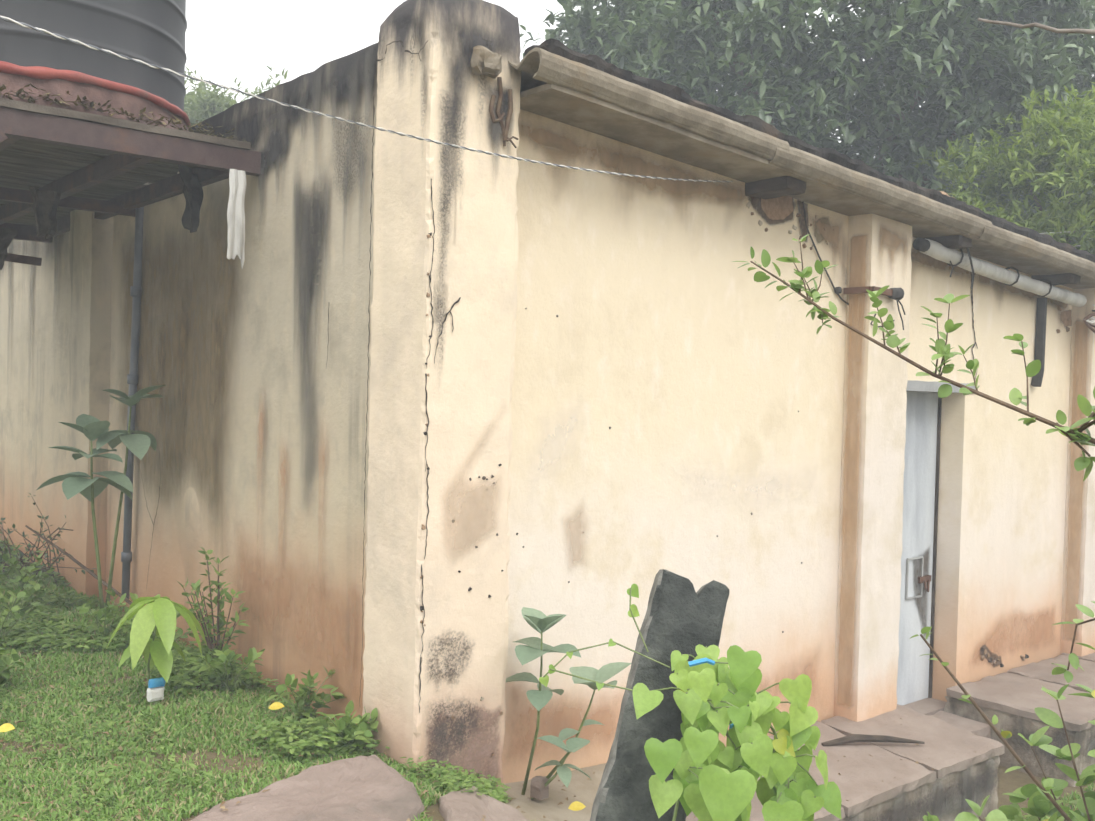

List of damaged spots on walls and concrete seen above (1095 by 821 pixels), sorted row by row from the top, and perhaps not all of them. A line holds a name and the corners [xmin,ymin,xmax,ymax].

leakage [445,23,508,135]
leakage [206,56,373,473]
crack [434,298,460,364]
leakage [429,636,470,677]
leakage [432,702,478,763]